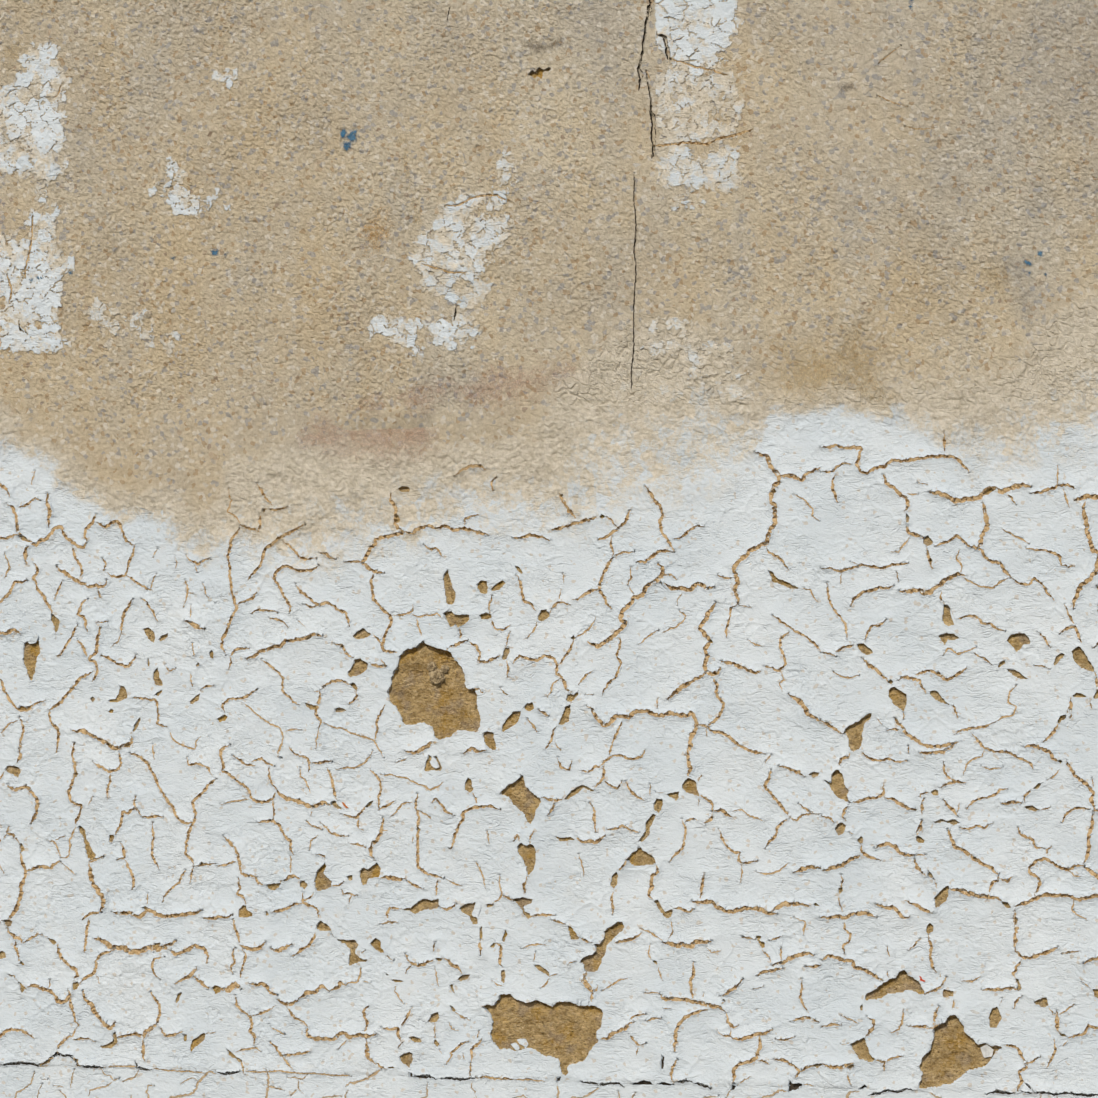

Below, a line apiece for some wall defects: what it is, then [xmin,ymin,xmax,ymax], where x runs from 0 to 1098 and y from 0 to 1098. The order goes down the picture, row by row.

flaking render [0,0,1098,413]
crack [629,0,754,391]
peeling [511,1039,528,1051]
peeling [980,1043,994,1058]